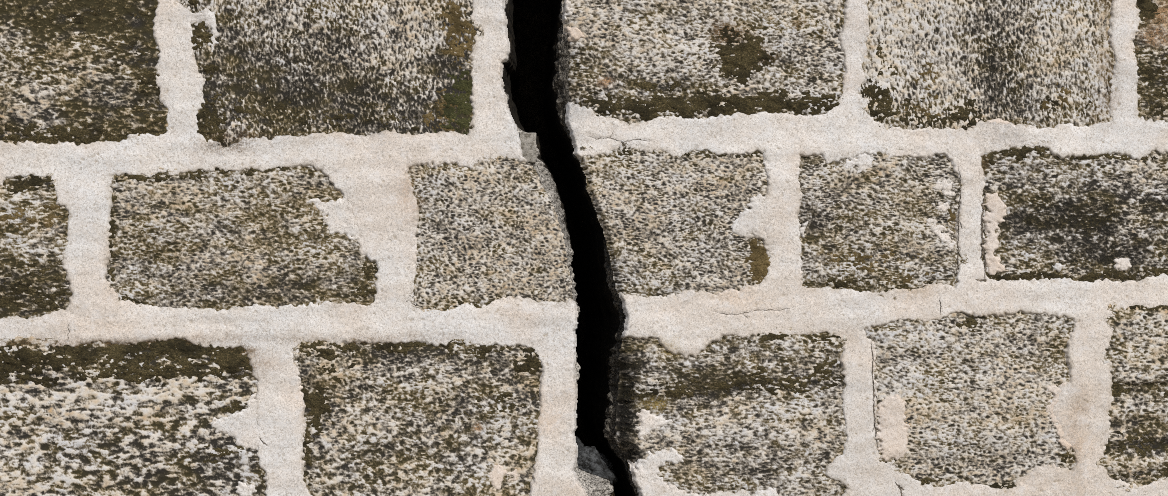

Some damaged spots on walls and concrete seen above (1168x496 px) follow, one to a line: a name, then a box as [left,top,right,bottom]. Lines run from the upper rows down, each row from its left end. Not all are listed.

crack [502,0,647,496]